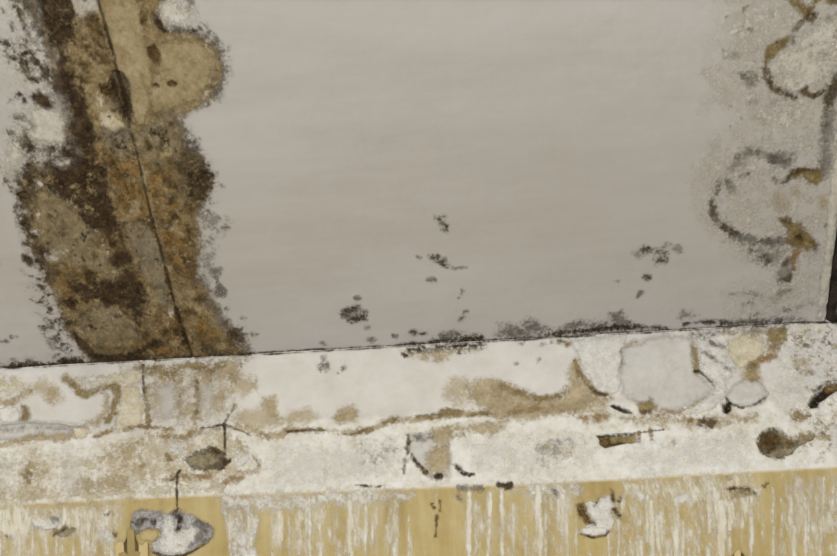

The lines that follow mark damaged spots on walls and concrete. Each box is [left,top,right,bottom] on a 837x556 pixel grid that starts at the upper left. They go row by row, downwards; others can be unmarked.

damp [732,0,837,185]
crack [43,0,205,429]
damp [0,0,258,426]
damp [334,360,612,436]
crack [238,321,827,356]
peeling [571,334,764,415]
flaking render [792,380,837,422]
flaking render [757,428,830,458]
flaking render [130,509,213,556]
damp [146,425,416,556]
flaking render [578,492,621,539]
damp [607,474,837,556]